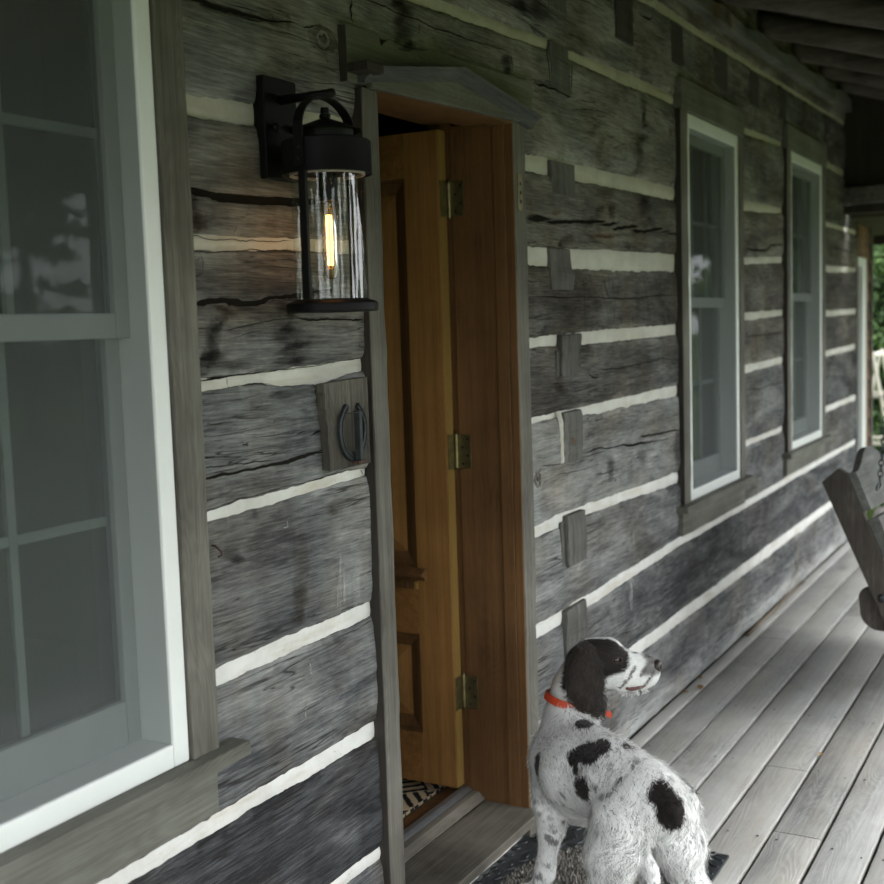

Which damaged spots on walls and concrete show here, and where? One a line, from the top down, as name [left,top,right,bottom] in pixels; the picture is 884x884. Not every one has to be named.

crack [193,0,317,28]
crack [191,187,333,207]
crack [527,215,675,235]
crack [193,226,290,277]
crack [197,289,363,339]
crack [205,414,322,480]
crack [209,469,367,510]